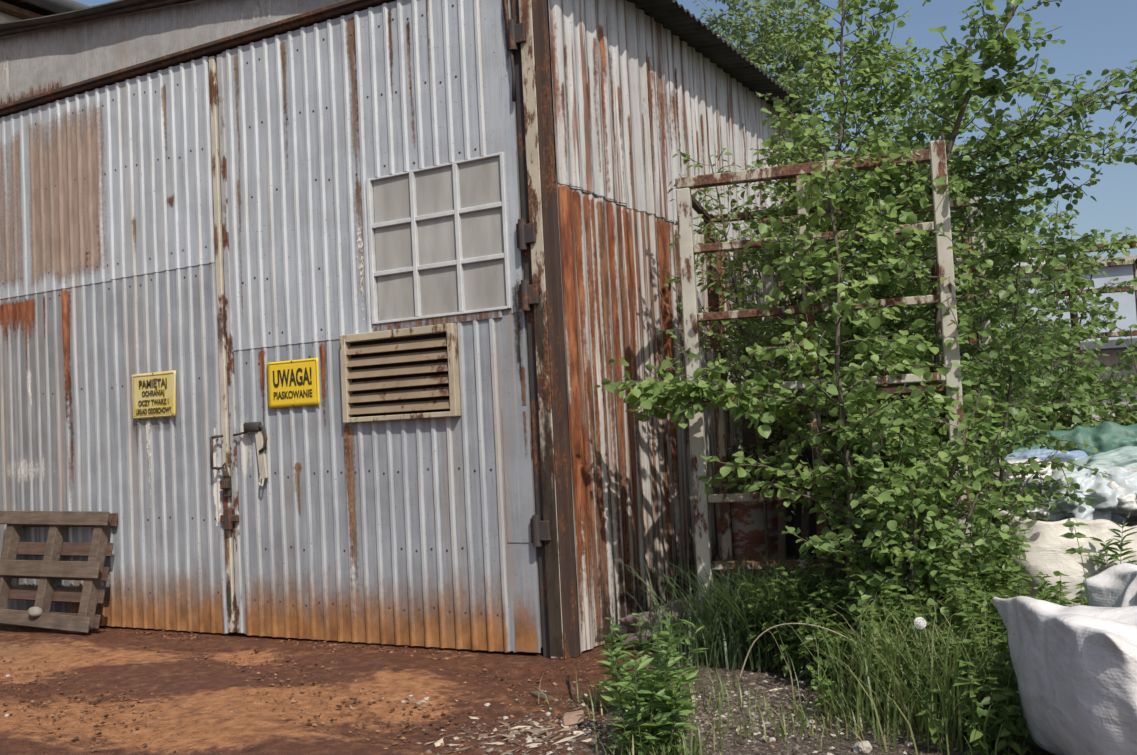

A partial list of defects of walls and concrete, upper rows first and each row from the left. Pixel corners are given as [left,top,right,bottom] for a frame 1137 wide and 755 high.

corrosion [280,41,288,158]
corrosion [347,18,362,278]
corrosion [406,22,414,137]
corrosion [551,17,729,184]
corrosion [0,297,45,368]
corrosion [61,290,73,483]
corrosion [558,185,689,630]
corrosion [343,425,357,575]